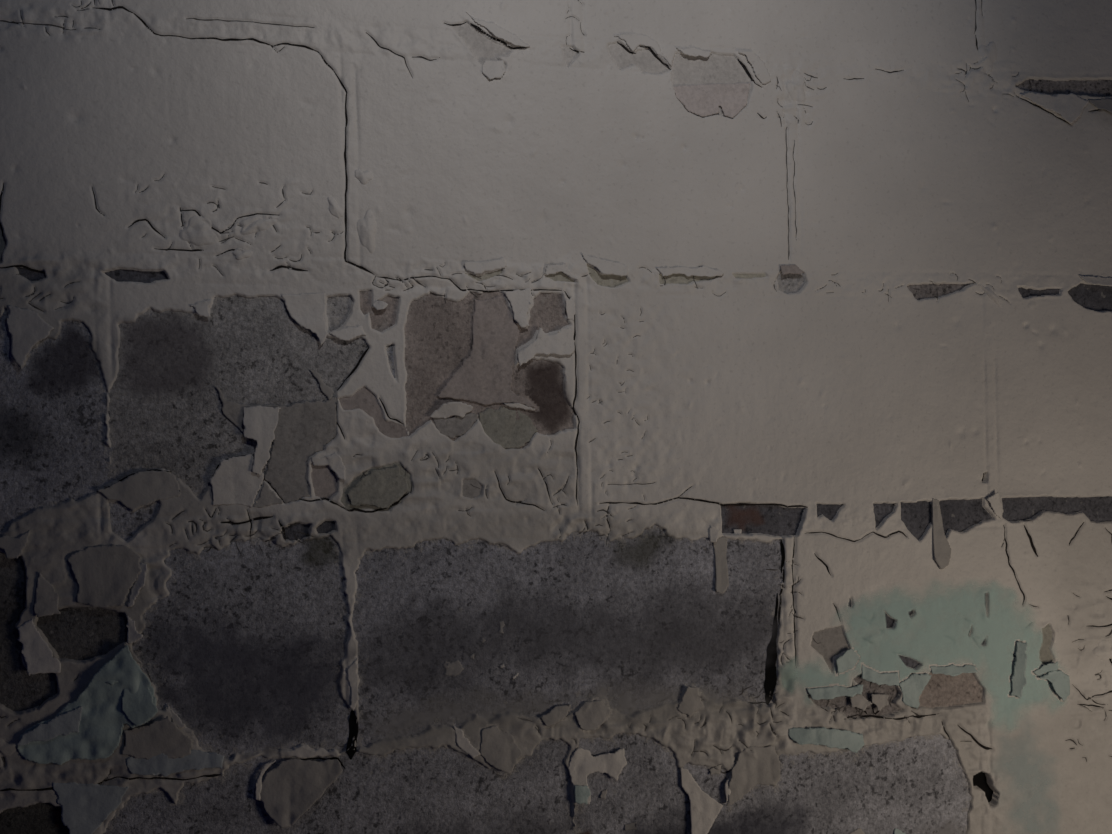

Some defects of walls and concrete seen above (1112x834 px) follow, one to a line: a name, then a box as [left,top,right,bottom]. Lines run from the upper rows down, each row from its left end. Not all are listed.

peeling [607,33,672,74]
peeling [1016,79,1112,123]
peeling [1018,275,1112,311]
crack [0,0,907,785]
leakage [530,365,567,429]
peeling [0,253,983,834]
peeling [873,492,1112,569]
crack [1002,520,1038,626]
crack [1068,590,1112,651]
crack [1073,671,1112,721]
crack [0,757,54,791]